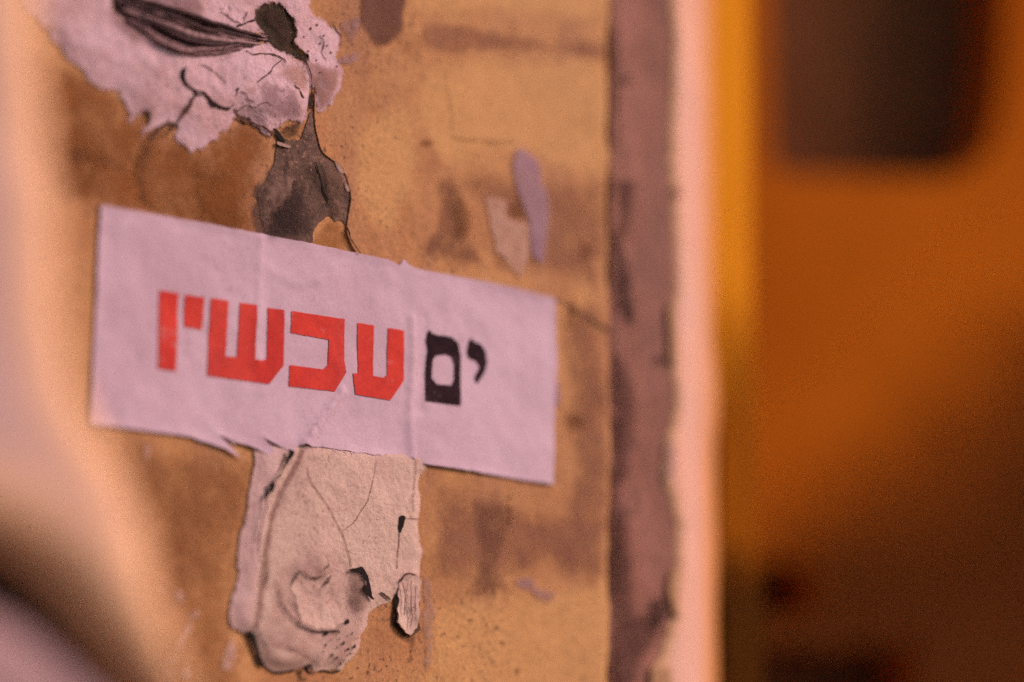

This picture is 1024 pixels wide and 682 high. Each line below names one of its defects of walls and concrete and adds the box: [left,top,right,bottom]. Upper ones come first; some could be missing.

flaking render [35,0,358,251]
leakage [266,87,301,135]
flaking render [230,441,428,672]